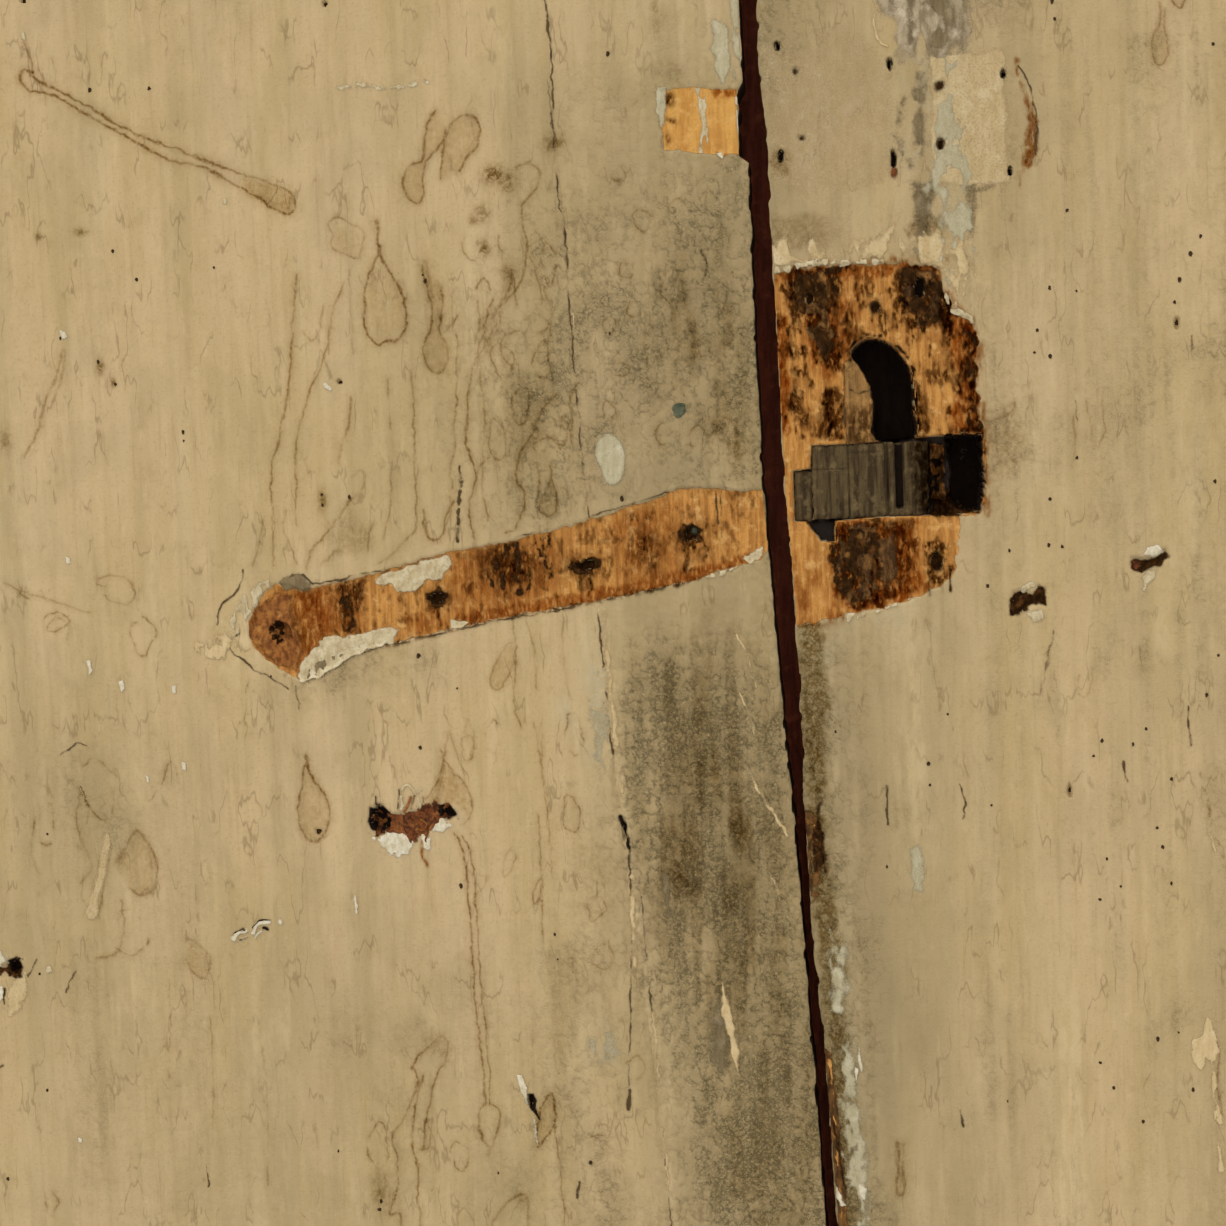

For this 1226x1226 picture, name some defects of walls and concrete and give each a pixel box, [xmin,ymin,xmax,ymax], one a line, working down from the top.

peeling [872,0,971,58]
peeling [656,0,741,159]
crack [544,0,568,267]
crack [568,297,583,465]
spalling [1131,545,1169,591]
spalling [1010,581,1046,623]
spalling [368,806,391,833]
spalling [437,804,457,816]
damp [750,773,788,836]
spalling [0,951,52,1017]
damp [710,1000,729,1074]